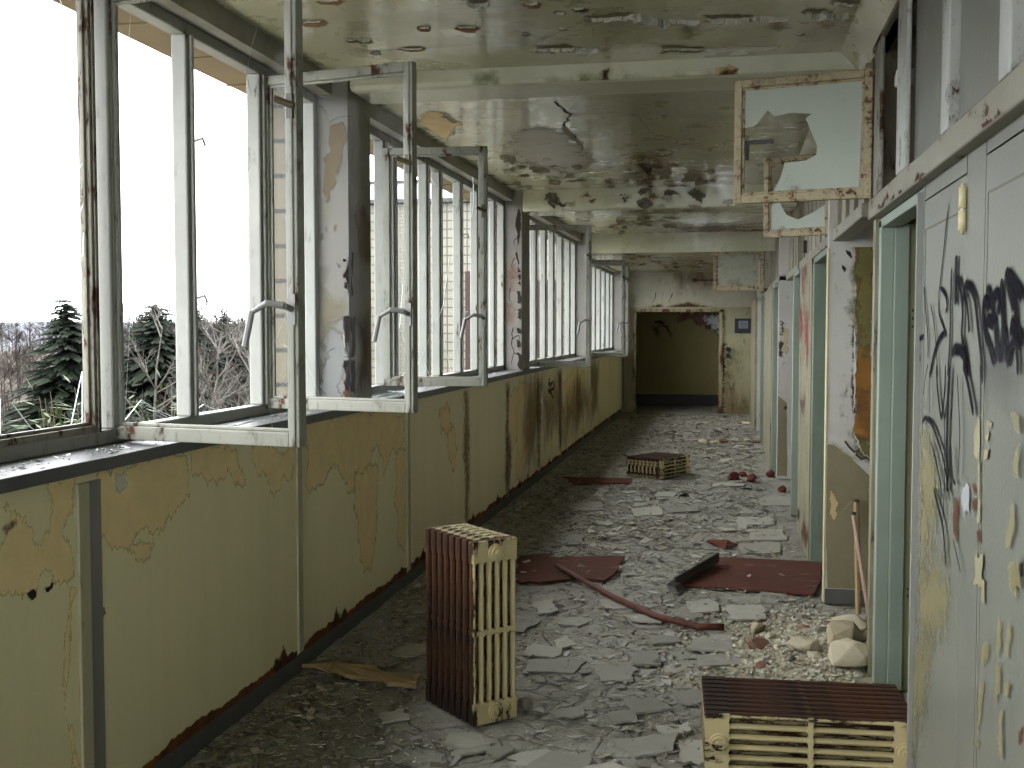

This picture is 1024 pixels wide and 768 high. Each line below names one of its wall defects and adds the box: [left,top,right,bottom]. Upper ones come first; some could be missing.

peeling [455,25,480,33]
peeling [553,7,790,31]
crack [518,102,620,155]
peeling [0,477,76,710]
peeling [96,444,294,562]
peeling [306,412,406,573]
damp [524,363,598,448]
peeling [826,247,873,590]
peeling [973,553,984,604]
peeling [974,416,992,524]
peeling [1005,503,1020,597]
corrosion [143,549,426,768]